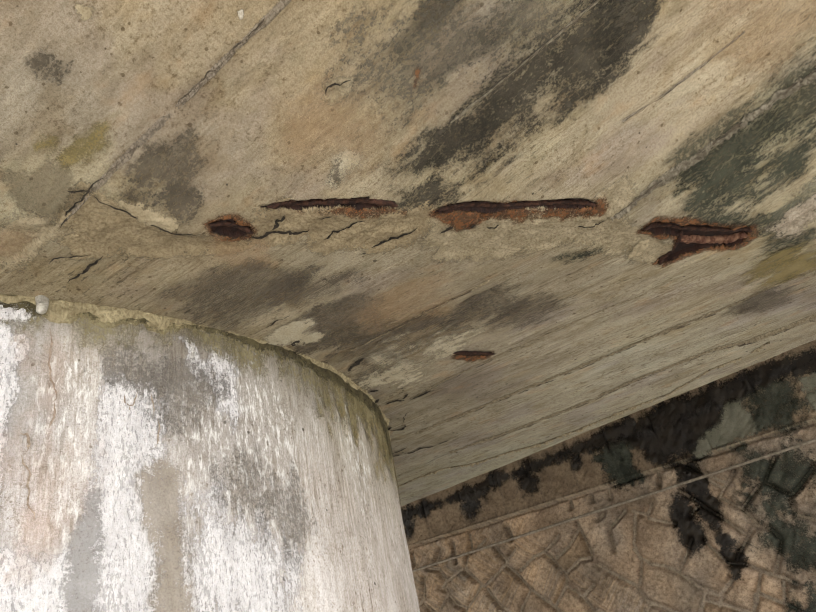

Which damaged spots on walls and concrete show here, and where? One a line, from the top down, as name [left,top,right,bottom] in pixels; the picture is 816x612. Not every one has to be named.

water stain [325,0,664,217]
water stain [666,43,816,189]
crack [50,255,103,282]
crack [58,178,200,236]
spalling [0,176,816,271]